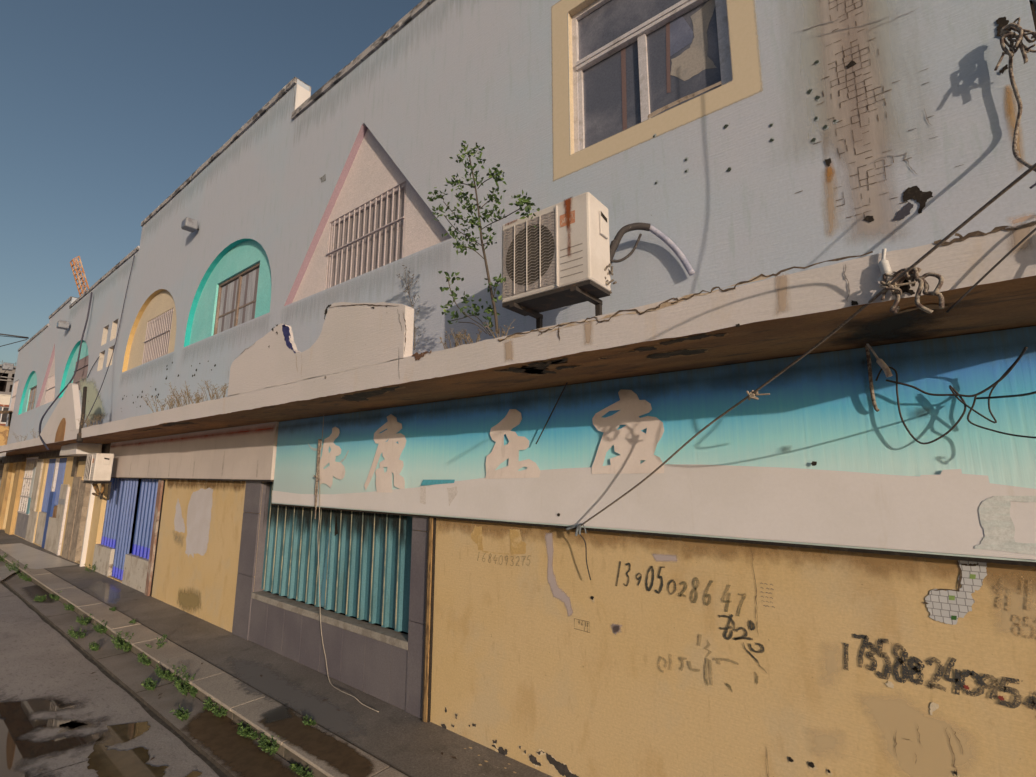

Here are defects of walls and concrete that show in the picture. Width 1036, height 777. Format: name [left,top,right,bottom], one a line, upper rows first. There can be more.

water stain [806,0,895,235]
spalling [893,186,933,220]
peeling [272,324,296,353]
peeling [324,304,406,402]
peeling [493,358,581,376]
peeling [492,739,580,777]